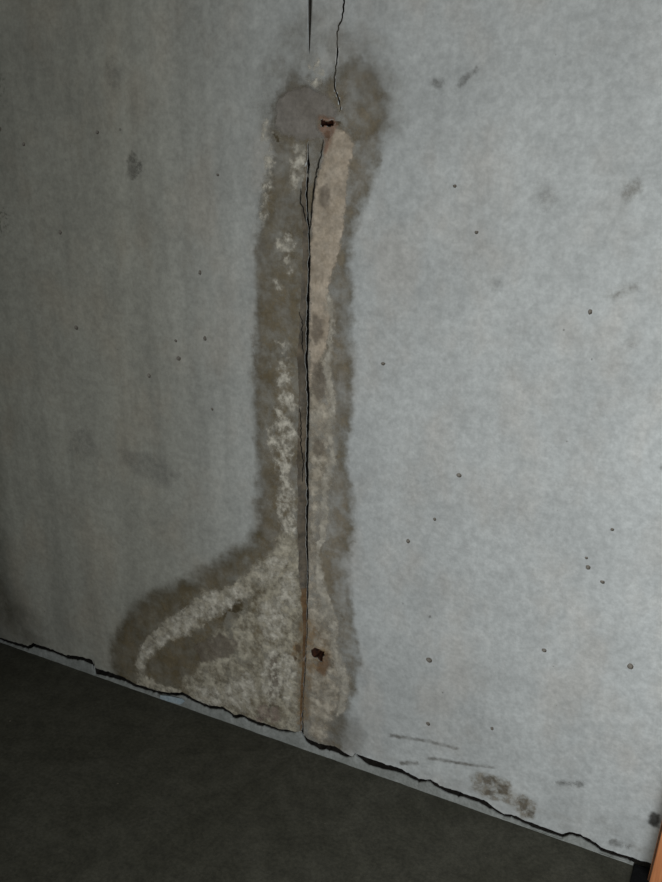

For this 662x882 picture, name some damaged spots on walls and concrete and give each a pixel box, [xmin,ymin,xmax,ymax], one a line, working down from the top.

crack [334,0,345,110]
crack [0,140,350,757]
leakage [111,71,384,749]
corrosion [294,588,328,731]
crack [357,754,651,868]